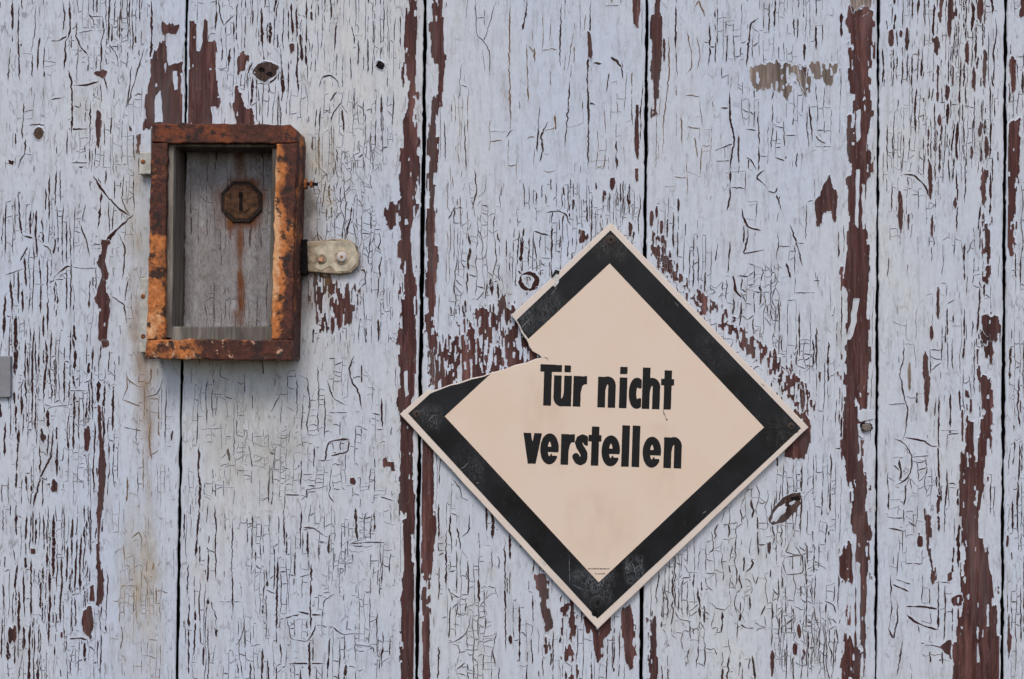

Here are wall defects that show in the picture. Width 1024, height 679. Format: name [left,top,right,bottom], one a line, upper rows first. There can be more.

peeling [129,19,261,156]
peeling [94,239,112,349]
crack [0,0,407,679]
corrosion [236,269,244,316]
peeling [306,272,362,335]
peeling [382,0,542,679]
crack [432,0,1024,679]
peeling [648,204,821,461]
peeling [748,0,911,679]
peeling [80,404,107,640]
peeling [533,572,660,679]
peeling [916,313,1014,679]